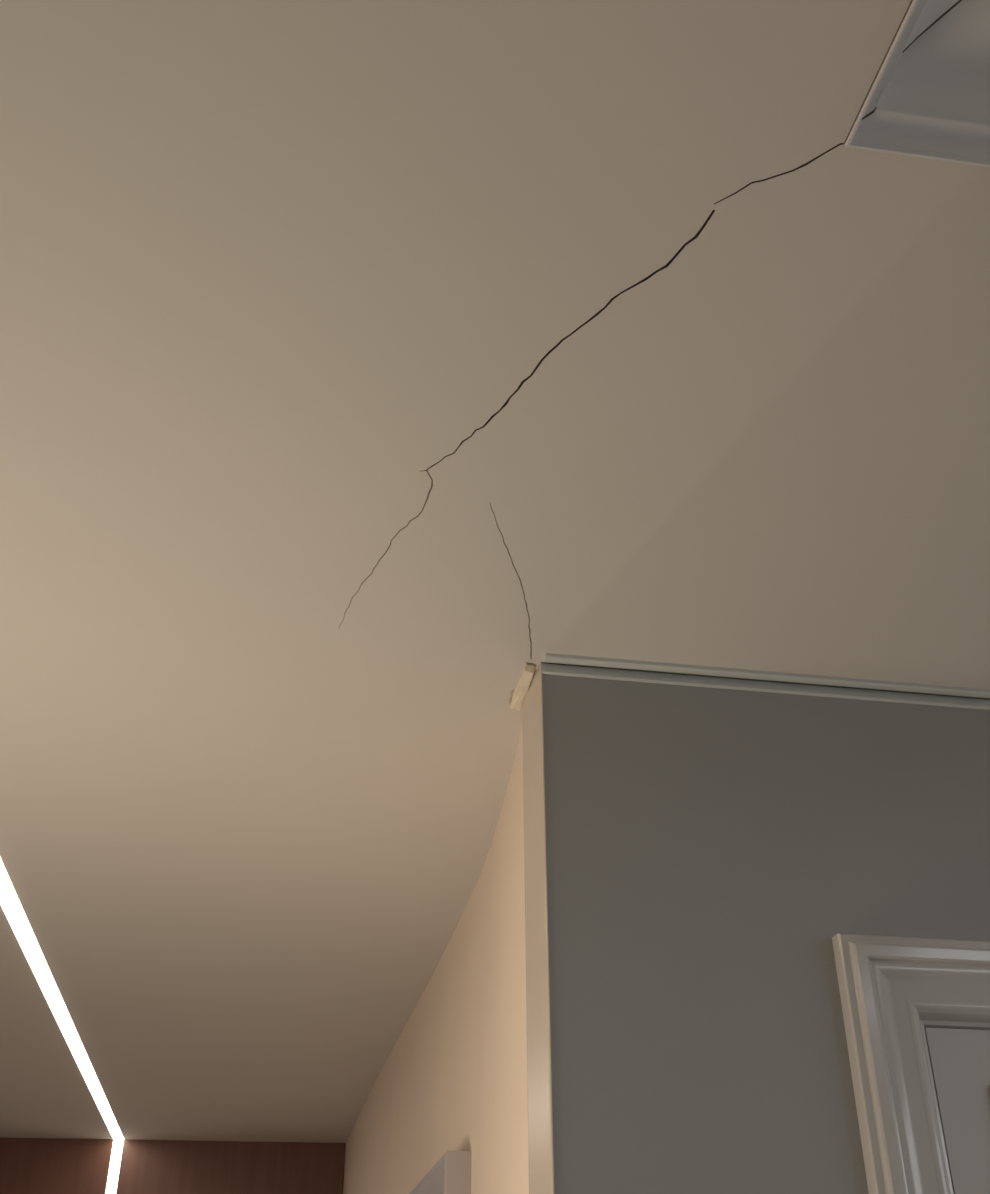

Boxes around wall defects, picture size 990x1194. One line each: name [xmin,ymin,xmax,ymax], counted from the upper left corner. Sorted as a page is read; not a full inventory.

crack [902,0,962,53]
crack [339,143,843,627]
crack [490,505,532,659]